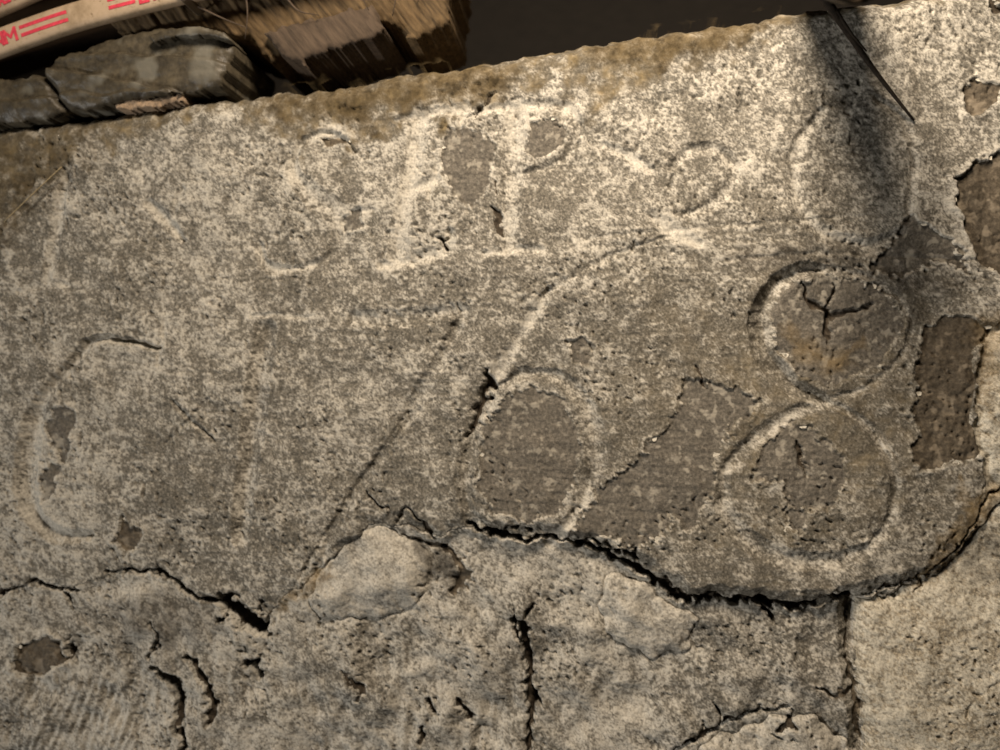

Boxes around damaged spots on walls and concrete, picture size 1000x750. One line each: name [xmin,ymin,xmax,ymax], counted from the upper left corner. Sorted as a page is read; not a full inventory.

spalling [454,0,905,72]
peeling [962,77,1000,116]
peeling [525,118,567,159]
peeling [441,127,497,207]
spalling [491,206,504,237]
peeling [771,152,1000,387]
peeling [910,316,993,470]
crack [367,494,435,538]
crack [0,577,79,602]
crack [108,566,221,602]
crack [468,520,961,750]
crack [674,704,789,749]